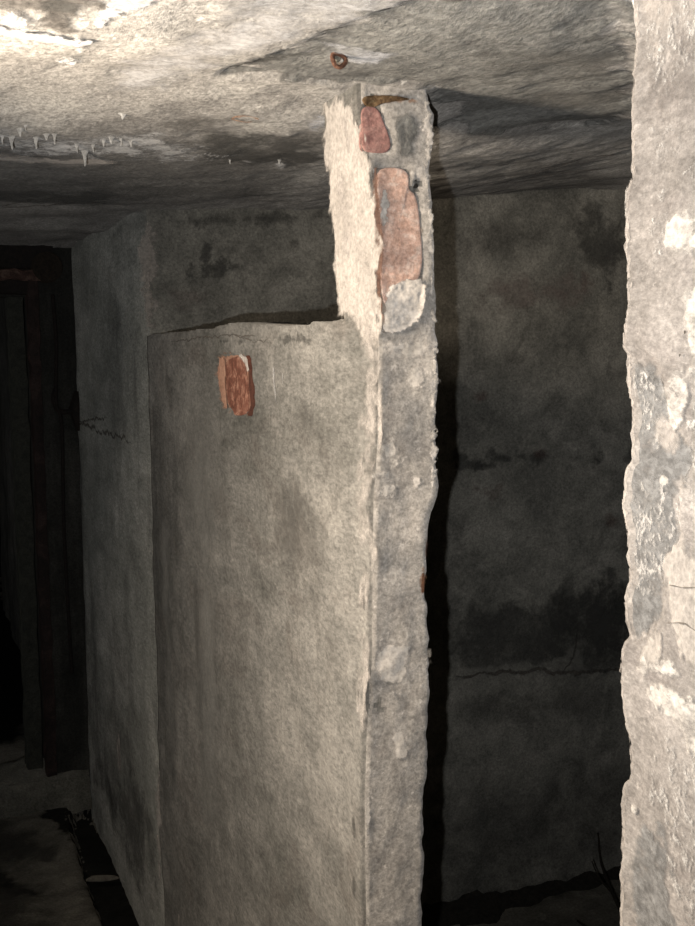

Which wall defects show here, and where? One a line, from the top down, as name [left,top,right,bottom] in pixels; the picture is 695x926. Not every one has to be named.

water stain [0,0,157,66]
water stain [0,129,324,169]
water stain [395,113,417,156]
spalling [217,0,639,417]
peeling [363,373,398,498]
spalling [413,429,438,487]
spalling [622,325,695,665]
spalling [620,823,675,926]